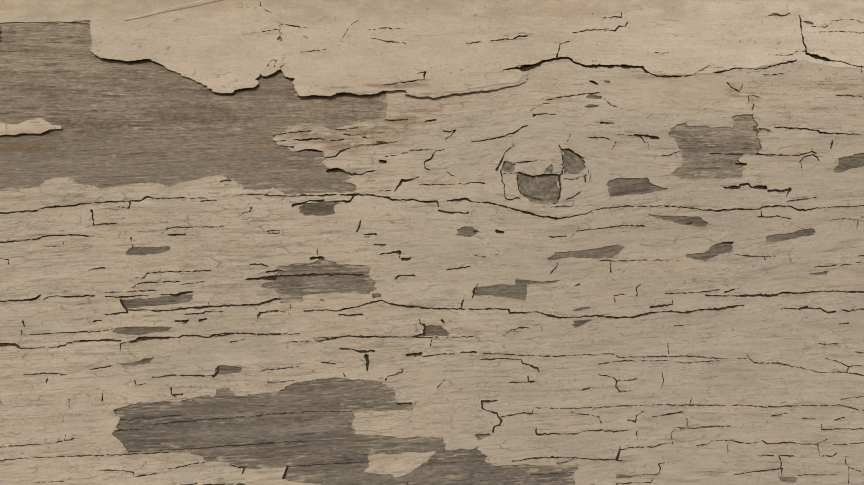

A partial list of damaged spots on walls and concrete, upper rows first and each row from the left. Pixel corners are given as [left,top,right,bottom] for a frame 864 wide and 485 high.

peeling [0,4,532,216]
crack [0,13,864,279]
peeling [668,114,770,180]
peeling [834,153,864,172]
peeling [606,178,667,197]
peeling [547,245,624,260]
peeling [259,259,381,303]
peeling [472,279,560,301]
peeling [215,365,242,377]
crack [0,249,864,485]
peeling [112,376,578,485]